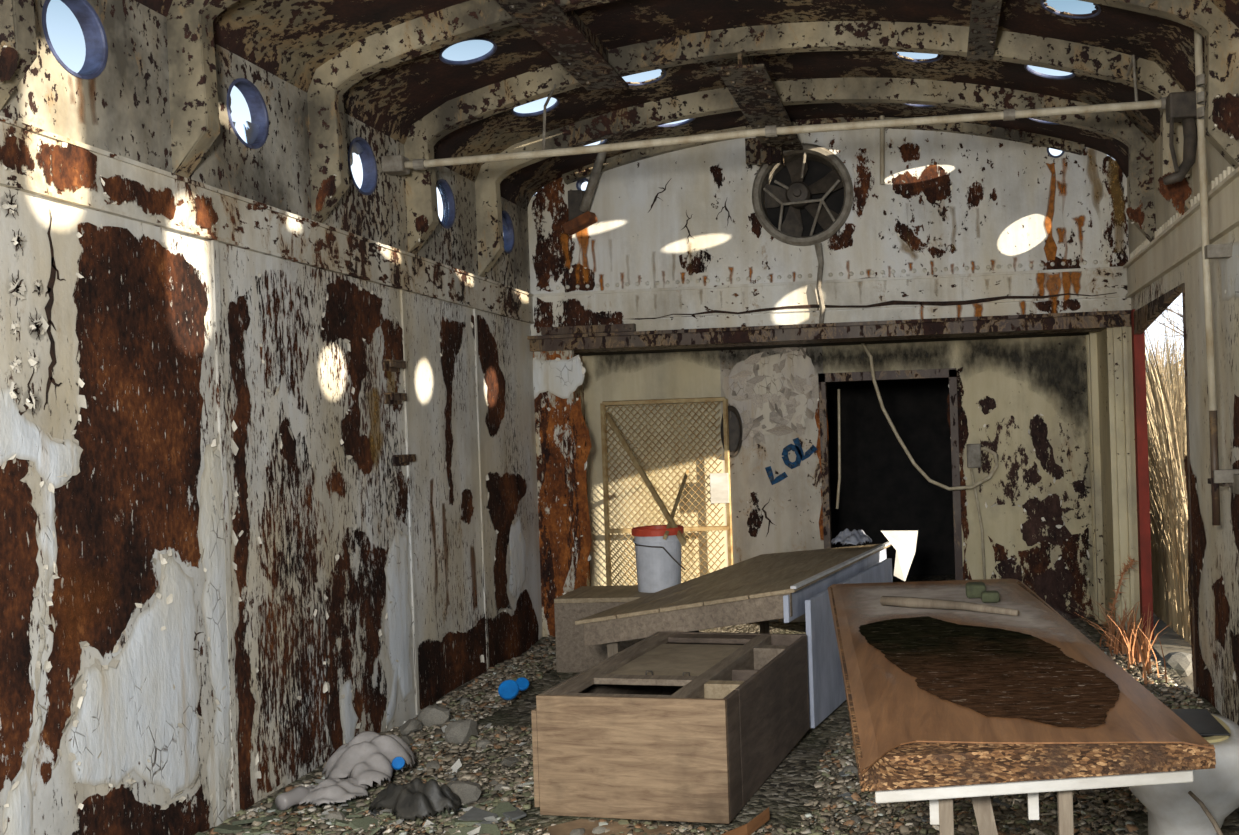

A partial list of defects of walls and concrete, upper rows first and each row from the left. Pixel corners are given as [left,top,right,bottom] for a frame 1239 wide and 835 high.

crack [1,190,66,418]
corrosion [0,135,176,219]
corrosion [531,177,624,334]
corrosion [1020,159,1085,315]
corrosion [1089,150,1145,267]
corrosion [0,222,209,791]
peeling [66,435,234,827]
corrosion [415,315,592,710]
peeling [719,346,824,567]
peeling [769,614,806,622]
corrosion [947,367,1094,619]
corrosion [1183,455,1239,707]